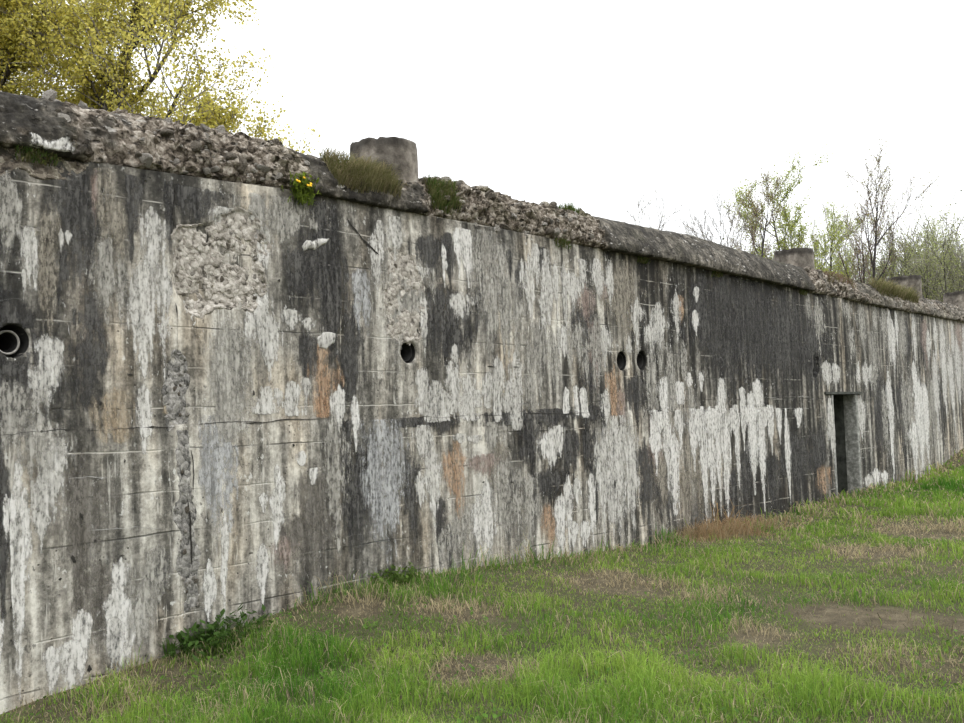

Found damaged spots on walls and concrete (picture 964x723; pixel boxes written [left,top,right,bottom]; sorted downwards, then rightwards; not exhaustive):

spalling [148,349,201,613]
spalling [171,206,280,319]
rust [313,345,344,418]
damp [0,133,840,697]
rust [443,441,511,514]
rust [577,258,646,420]
damp [841,303,964,489]